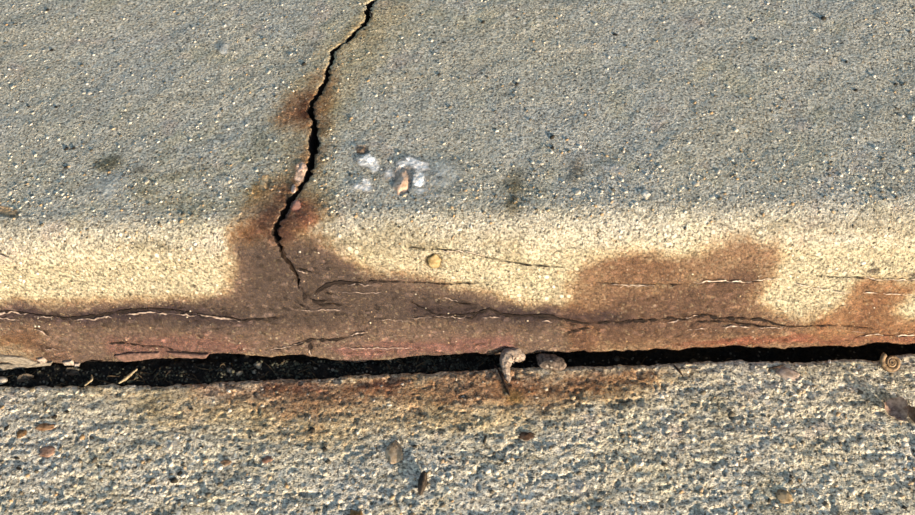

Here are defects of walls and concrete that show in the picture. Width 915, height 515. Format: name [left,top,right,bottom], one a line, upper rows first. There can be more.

crack [269,0,915,355]
crack [0,308,279,351]
corrosion [0,226,915,365]